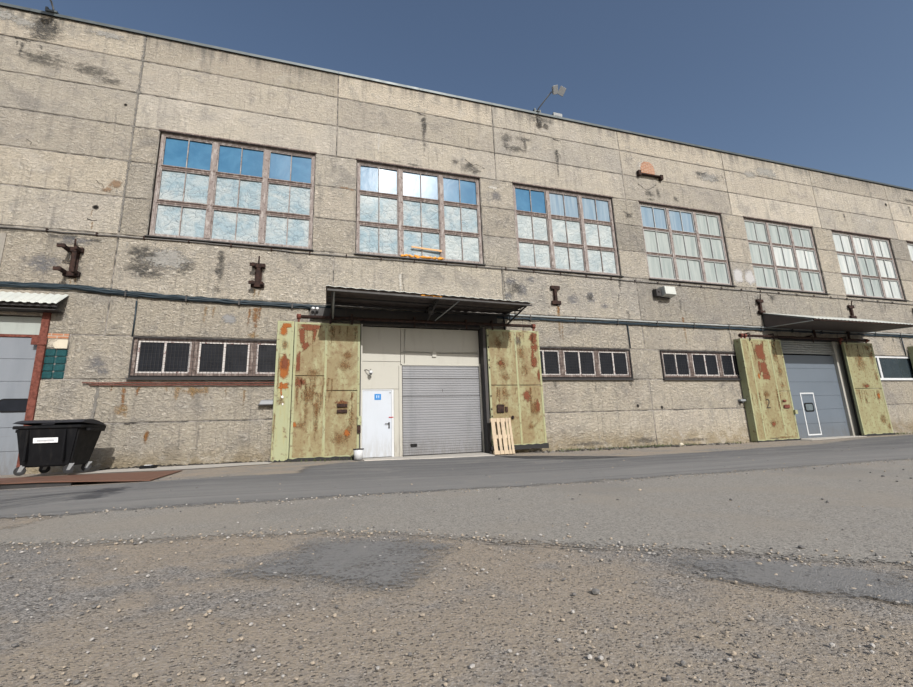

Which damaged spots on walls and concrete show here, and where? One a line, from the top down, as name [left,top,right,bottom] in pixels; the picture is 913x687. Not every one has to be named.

water stain [126,247,192,276]
rust [278,323,355,443]
rust [491,389,540,413]
rust [496,333,540,380]
rust [747,342,784,410]